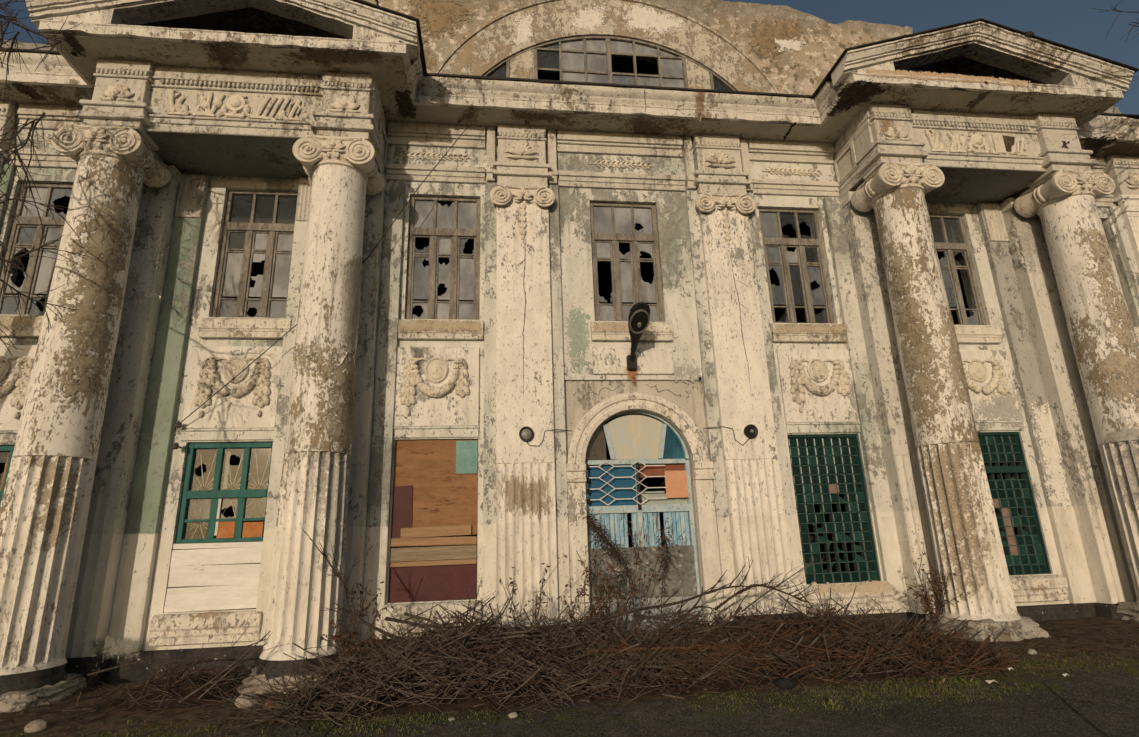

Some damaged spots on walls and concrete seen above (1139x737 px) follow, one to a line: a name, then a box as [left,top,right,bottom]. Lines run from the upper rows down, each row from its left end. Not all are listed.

spalling [404,0,476,70]
spalling [513,13,535,48]
spalling [620,2,688,37]
spalling [1002,135,1015,152]
peeling [50,194,163,413]
crack [515,244,527,397]
crack [731,261,751,391]
peeling [1081,228,1139,409]
peeling [27,452,82,551]
peeling [293,343,358,572]
peeling [884,238,1072,600]
peeling [1104,423,1139,517]